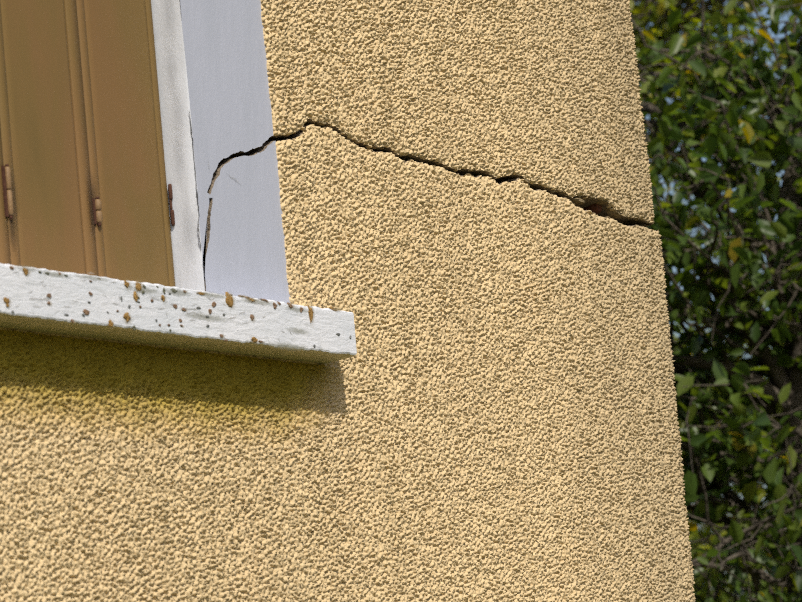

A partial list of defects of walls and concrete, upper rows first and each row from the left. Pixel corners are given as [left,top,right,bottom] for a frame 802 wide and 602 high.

crack [189,112,658,262]